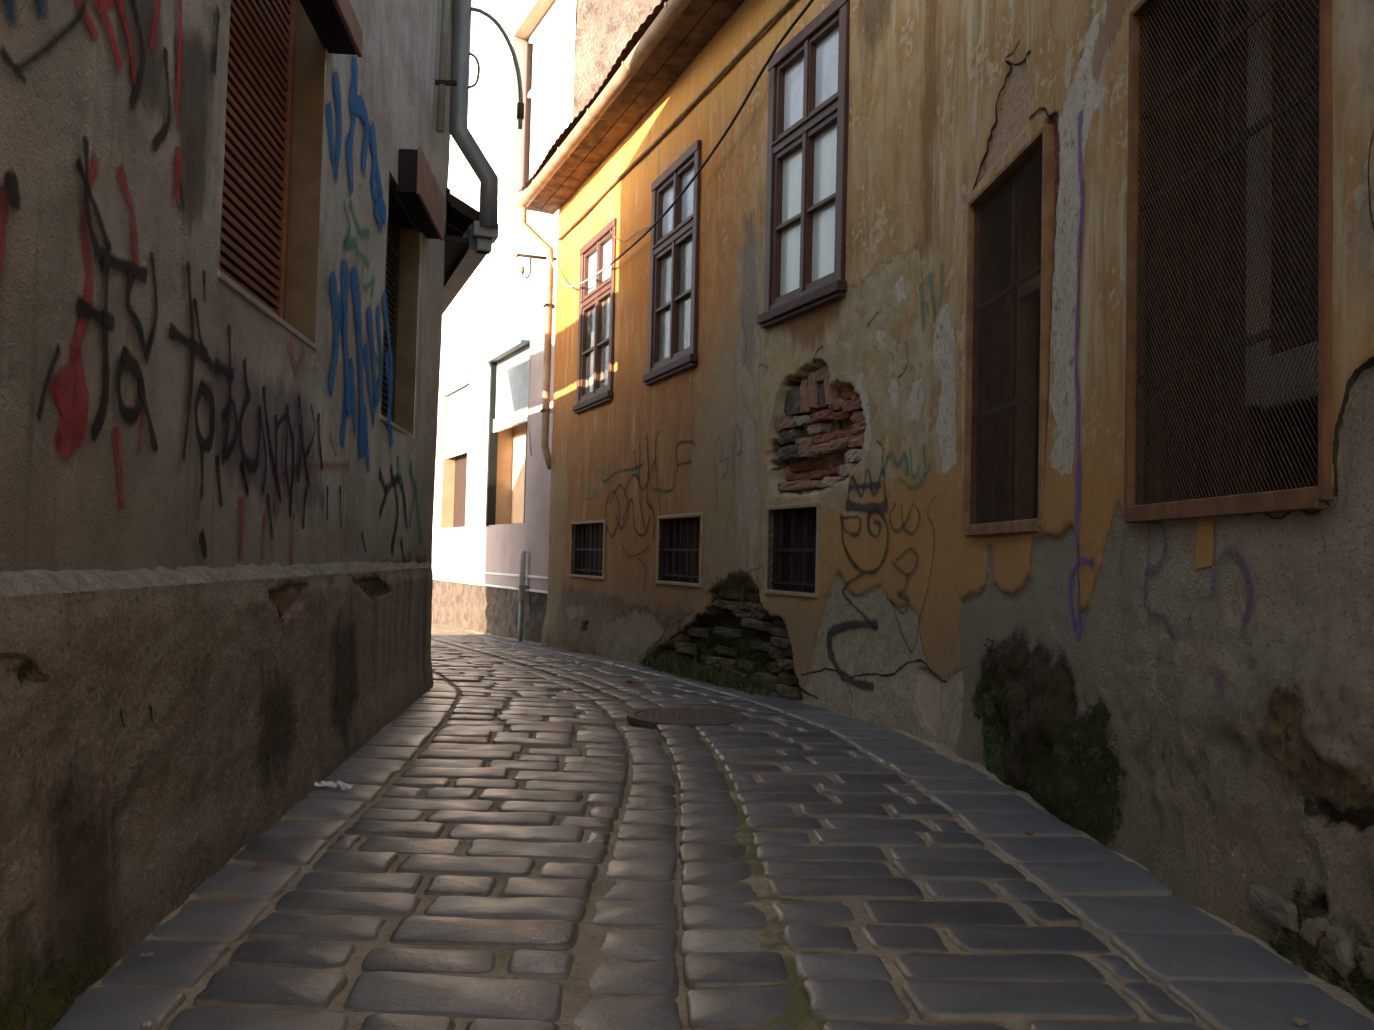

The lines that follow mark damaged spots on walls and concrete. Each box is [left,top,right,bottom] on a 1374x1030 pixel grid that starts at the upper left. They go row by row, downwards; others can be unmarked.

spalling [979,63,1029,182]
peeling [1045,1,1113,477]
crack [1366,130,1374,231]
peeling [759,245,957,523]
spalling [352,577,390,600]
spalling [566,365,1374,1014]